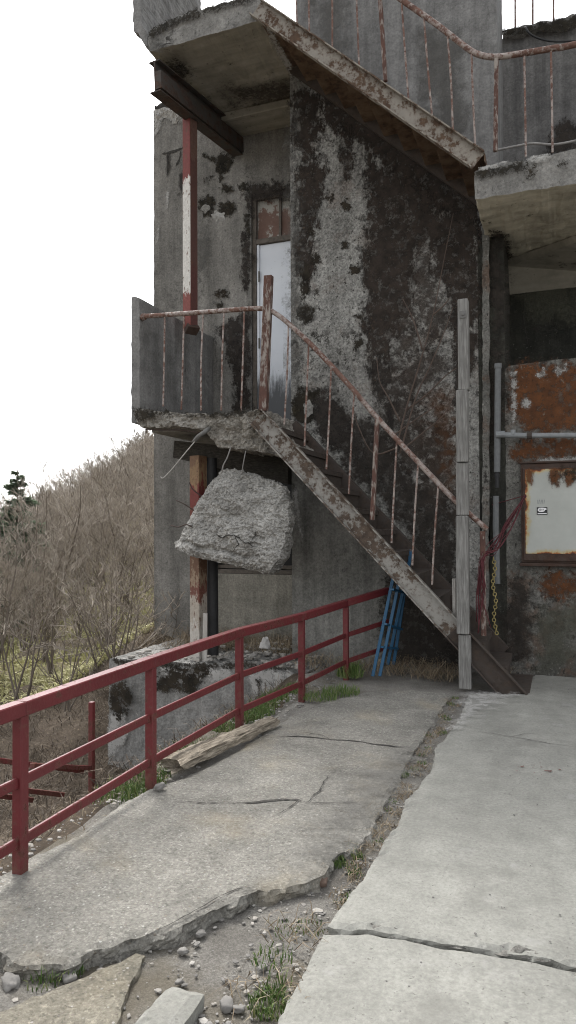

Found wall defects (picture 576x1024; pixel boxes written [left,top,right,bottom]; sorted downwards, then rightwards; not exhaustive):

leakage [197,28,576,586]
corrosion [414,383,457,490]
corrosion [503,357,576,487]
crack [280,732,416,748]
crack [186,776,356,813]
crack [362,923,466,949]
crack [495,945,549,962]